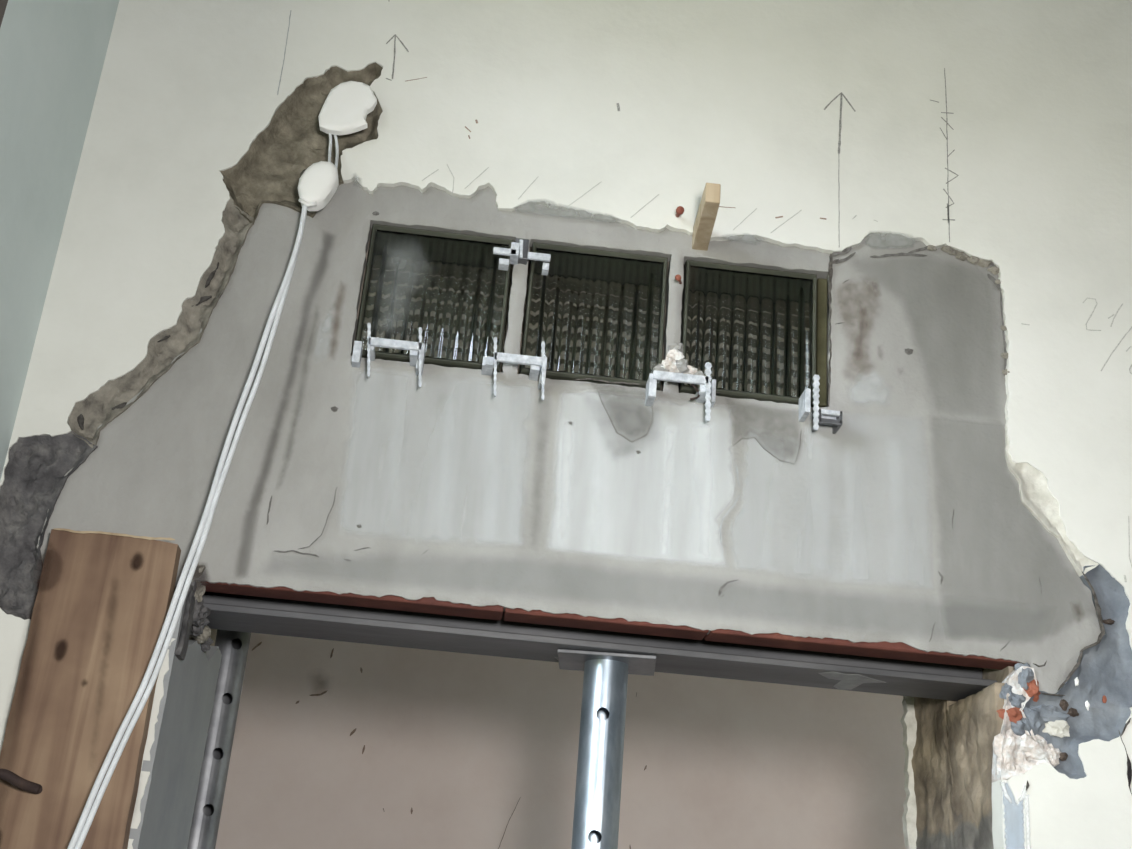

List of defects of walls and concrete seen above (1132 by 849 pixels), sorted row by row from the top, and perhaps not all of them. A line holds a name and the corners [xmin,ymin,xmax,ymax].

flaking render [832,246,856,264]
flaking render [870,245,1010,376]
flaking render [0,187,254,620]
water stain [565,388,653,552]
flaking render [166,581,197,660]
flaking render [900,430,1132,849]
crack [1119,718,1132,795]